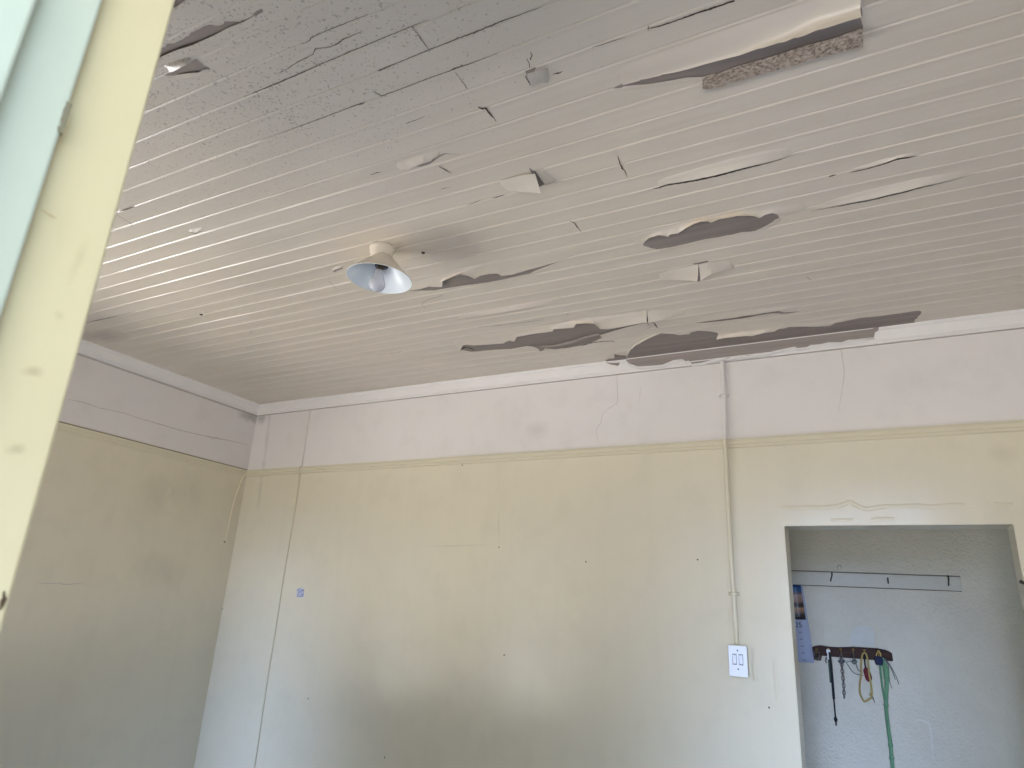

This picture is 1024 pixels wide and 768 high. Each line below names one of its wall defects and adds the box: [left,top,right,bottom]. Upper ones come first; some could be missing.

peeling [157,9,263,79]
crack [252,7,540,140]
peeling [525,52,563,86]
peeling [615,0,863,91]
peeling [498,168,555,194]
peeling [632,193,810,250]
peeling [409,241,589,294]
peeling [454,305,921,369]